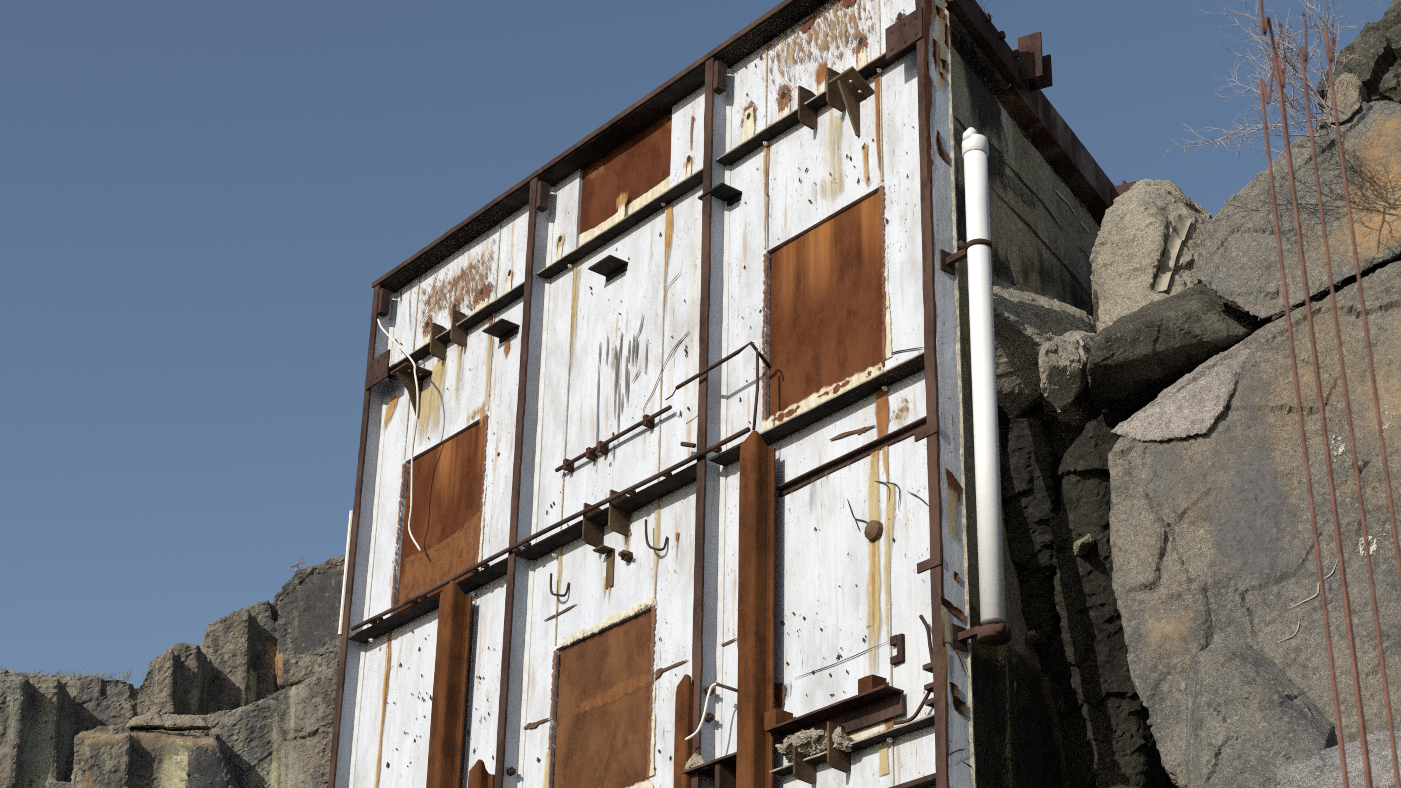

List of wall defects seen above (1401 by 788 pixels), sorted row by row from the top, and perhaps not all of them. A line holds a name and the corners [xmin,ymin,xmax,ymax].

corrosion [815,61,826,96]
corrosion [587,165,604,178]
corrosion [616,194,627,222]
corrosion [384,395,398,429]
corrosion [413,345,462,436]
corrosion [422,269,512,422]
corrosion [400,513,480,603]
corrosion [866,388,908,667]
corrosion [375,630,391,788]
corrosion [464,602,473,723]
corrosion [576,674,650,712]
leakage [973,654,1062,788]